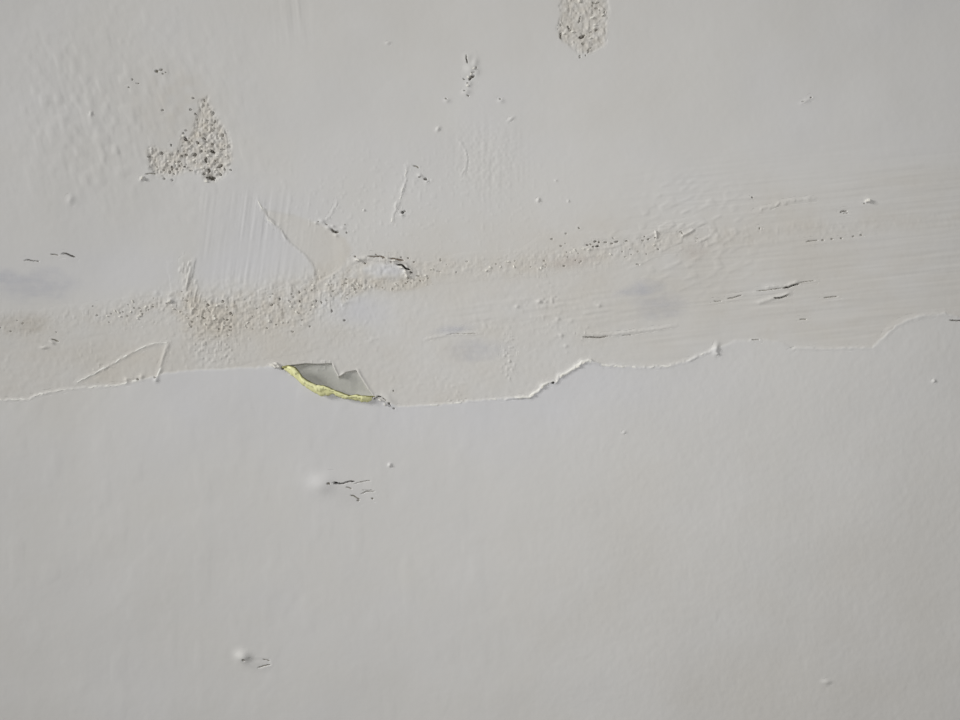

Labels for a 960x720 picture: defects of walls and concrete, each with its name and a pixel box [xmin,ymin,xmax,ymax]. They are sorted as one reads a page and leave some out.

spalling [556,0,611,62]
spalling [138,94,236,185]
flaking render [163,252,433,413]
crack [724,276,843,304]